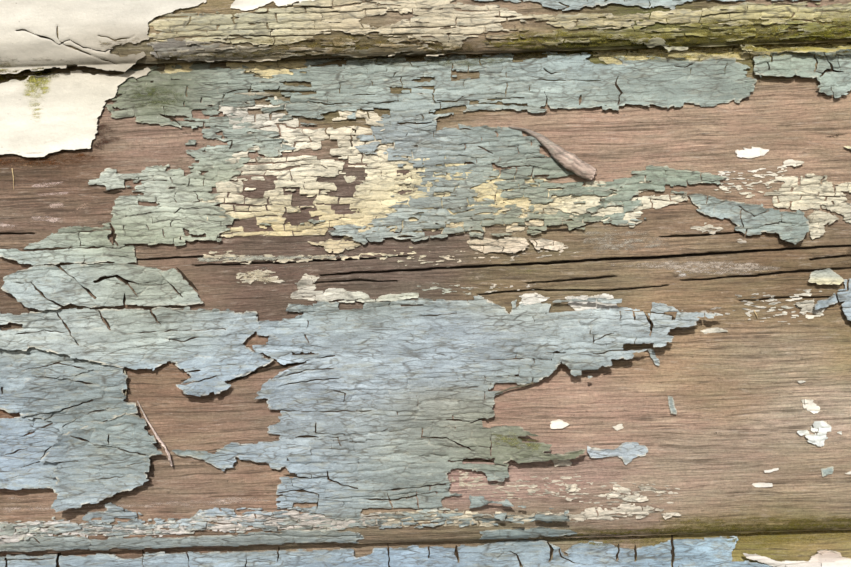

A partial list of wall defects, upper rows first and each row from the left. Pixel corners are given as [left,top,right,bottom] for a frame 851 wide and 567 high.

leakage [495,16,851,58]
peeling [0,0,851,266]
crack [137,232,851,295]
crack [739,294,830,302]
peeling [0,263,851,567]